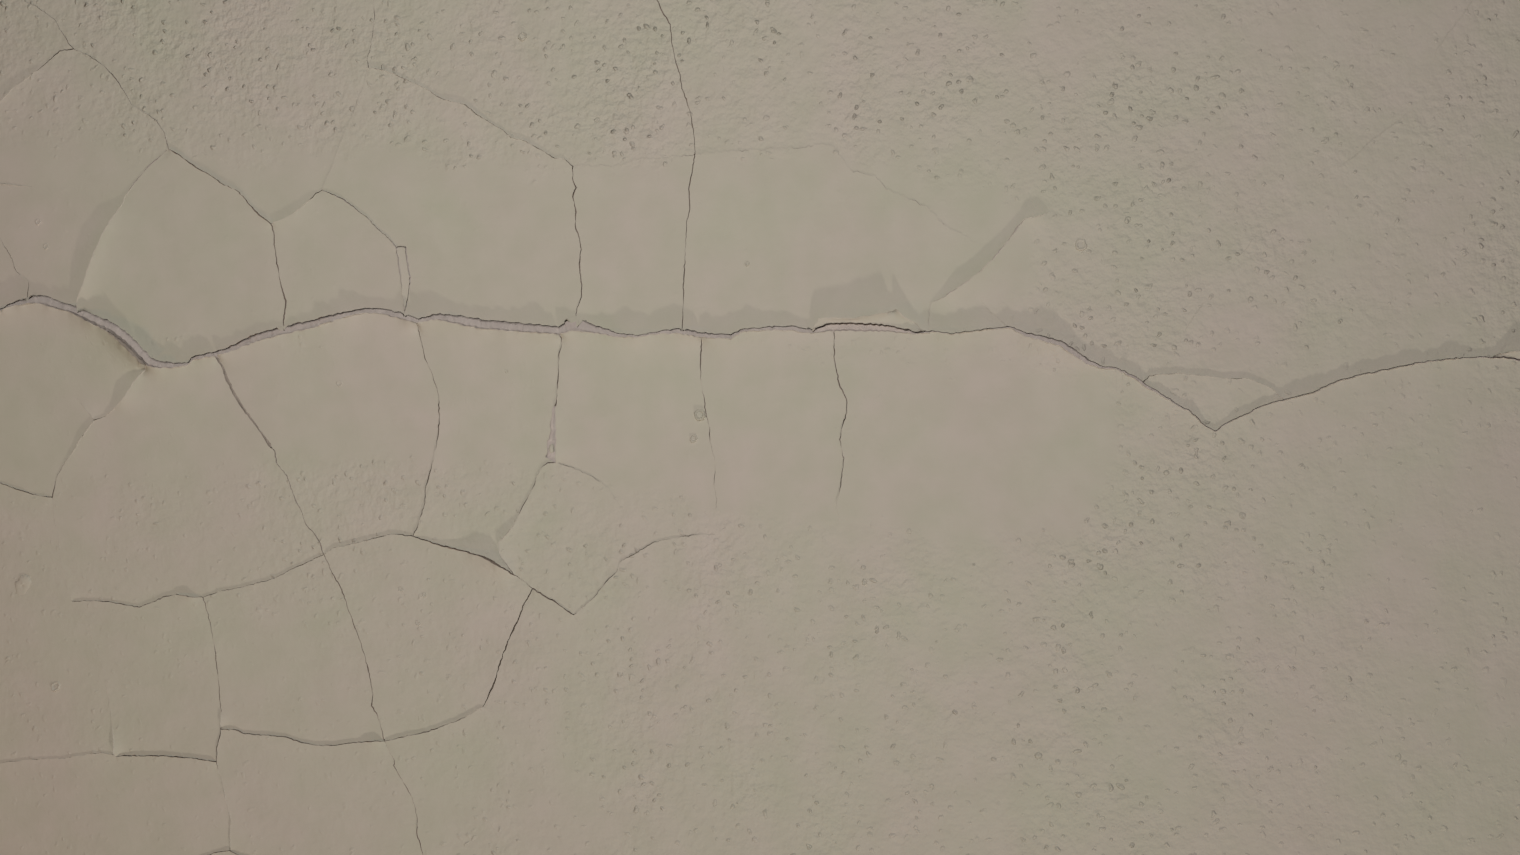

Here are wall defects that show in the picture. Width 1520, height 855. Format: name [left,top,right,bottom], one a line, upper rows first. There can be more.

crack [43,19,132,105]
crack [657,0,695,237]
peeling [0,0,1118,855]
crack [0,112,1520,751]
crack [118,755,217,764]
crack [393,758,423,854]